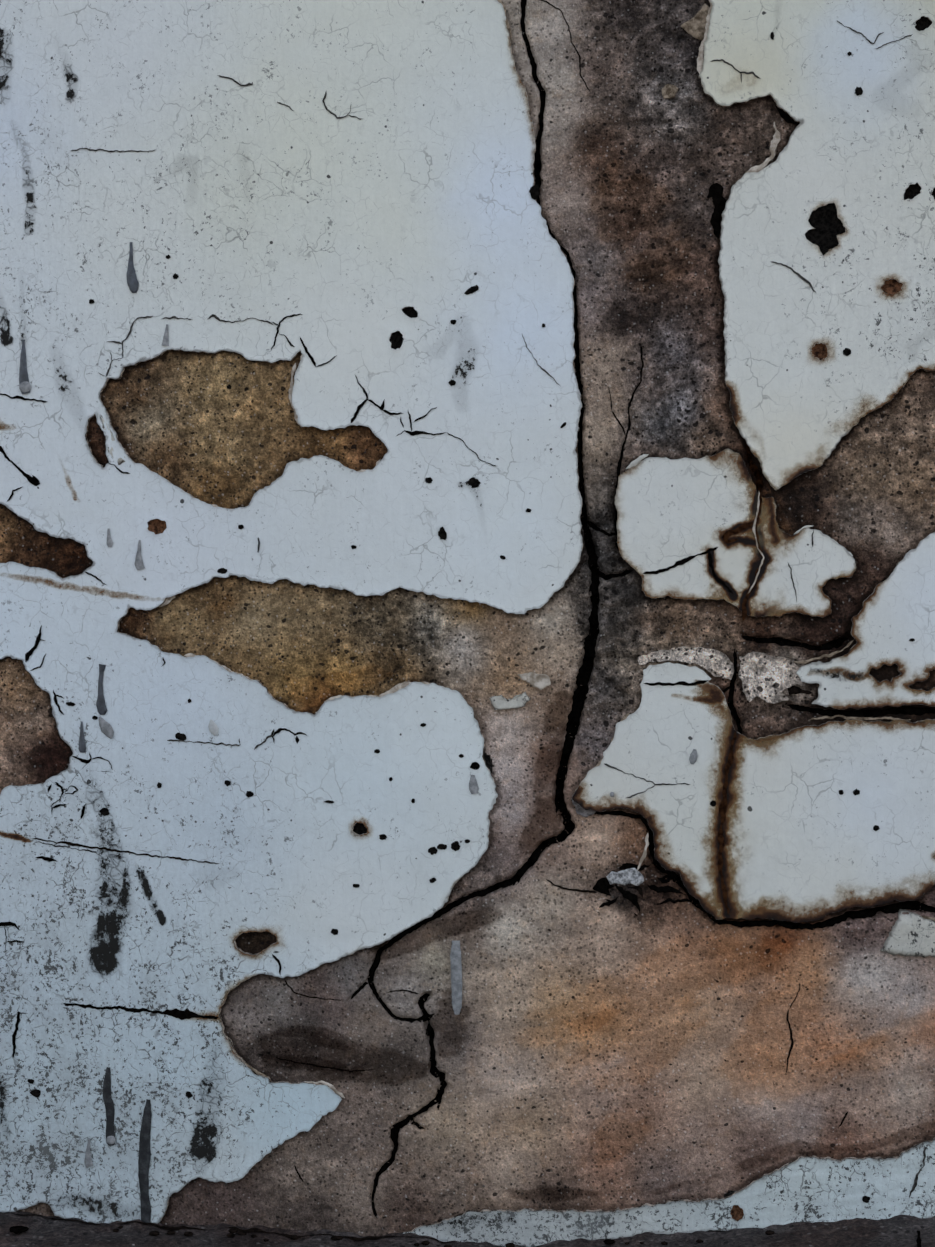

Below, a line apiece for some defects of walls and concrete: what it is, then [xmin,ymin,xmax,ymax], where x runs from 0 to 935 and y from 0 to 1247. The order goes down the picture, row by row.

peeling [915,17,932,31]
peeling [904,183,935,200]
peeling [805,203,846,256]
peeling [881,280,903,295]
peeling [811,343,828,360]
peeling [86,0,800,913]
peeling [0,504,93,578]
crack [272,0,935,1218]
peeling [0,657,75,794]
peeling [160,369,935,1237]
peeling [17,1202,59,1217]